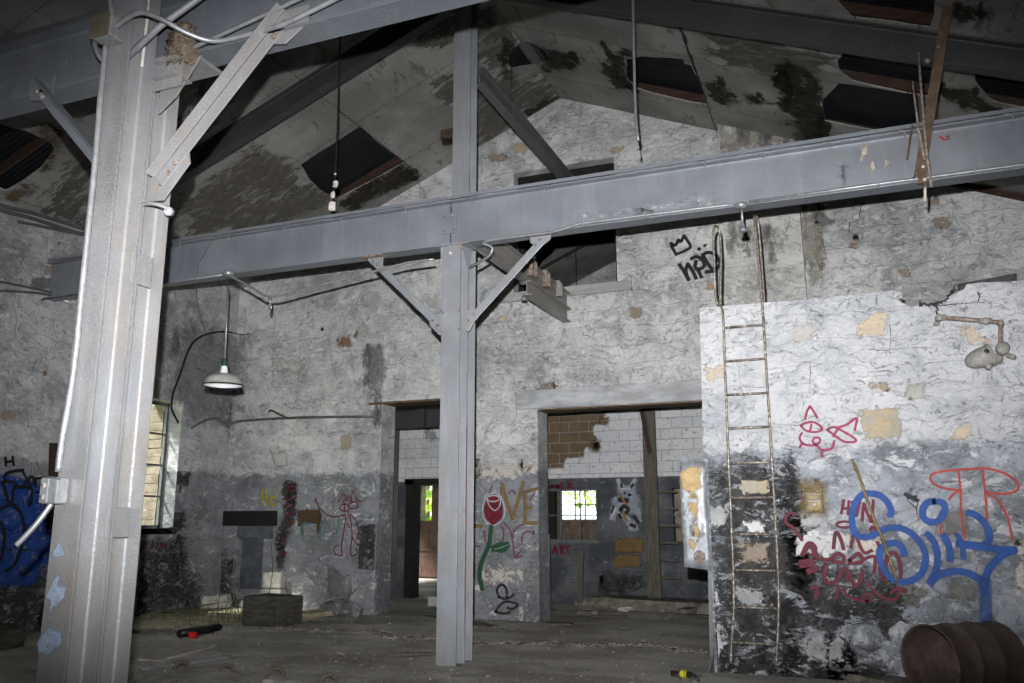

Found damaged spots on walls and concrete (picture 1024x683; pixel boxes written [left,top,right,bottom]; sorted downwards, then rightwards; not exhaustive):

water stain [542,48,585,73]
water stain [599,41,639,93]
water stain [704,59,833,140]
spalling [857,311,889,336]
crack [919,284,987,315]
water stain [363,344,384,426]
spalling [858,382,924,442]